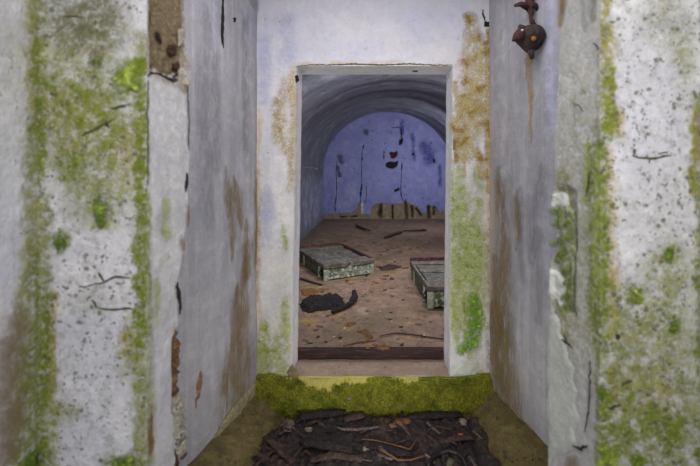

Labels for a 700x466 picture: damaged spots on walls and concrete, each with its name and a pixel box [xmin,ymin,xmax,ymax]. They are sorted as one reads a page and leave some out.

spalling [149,0,190,87]
crack [218,0,226,48]
crack [81,105,126,136]
corrosion [525,55,533,137]
crack [633,149,671,163]
peeling [324,200,445,219]
crack [78,272,133,311]
water stain [223,176,258,410]
peeling [547,192,580,466]
spalling [171,324,188,466]